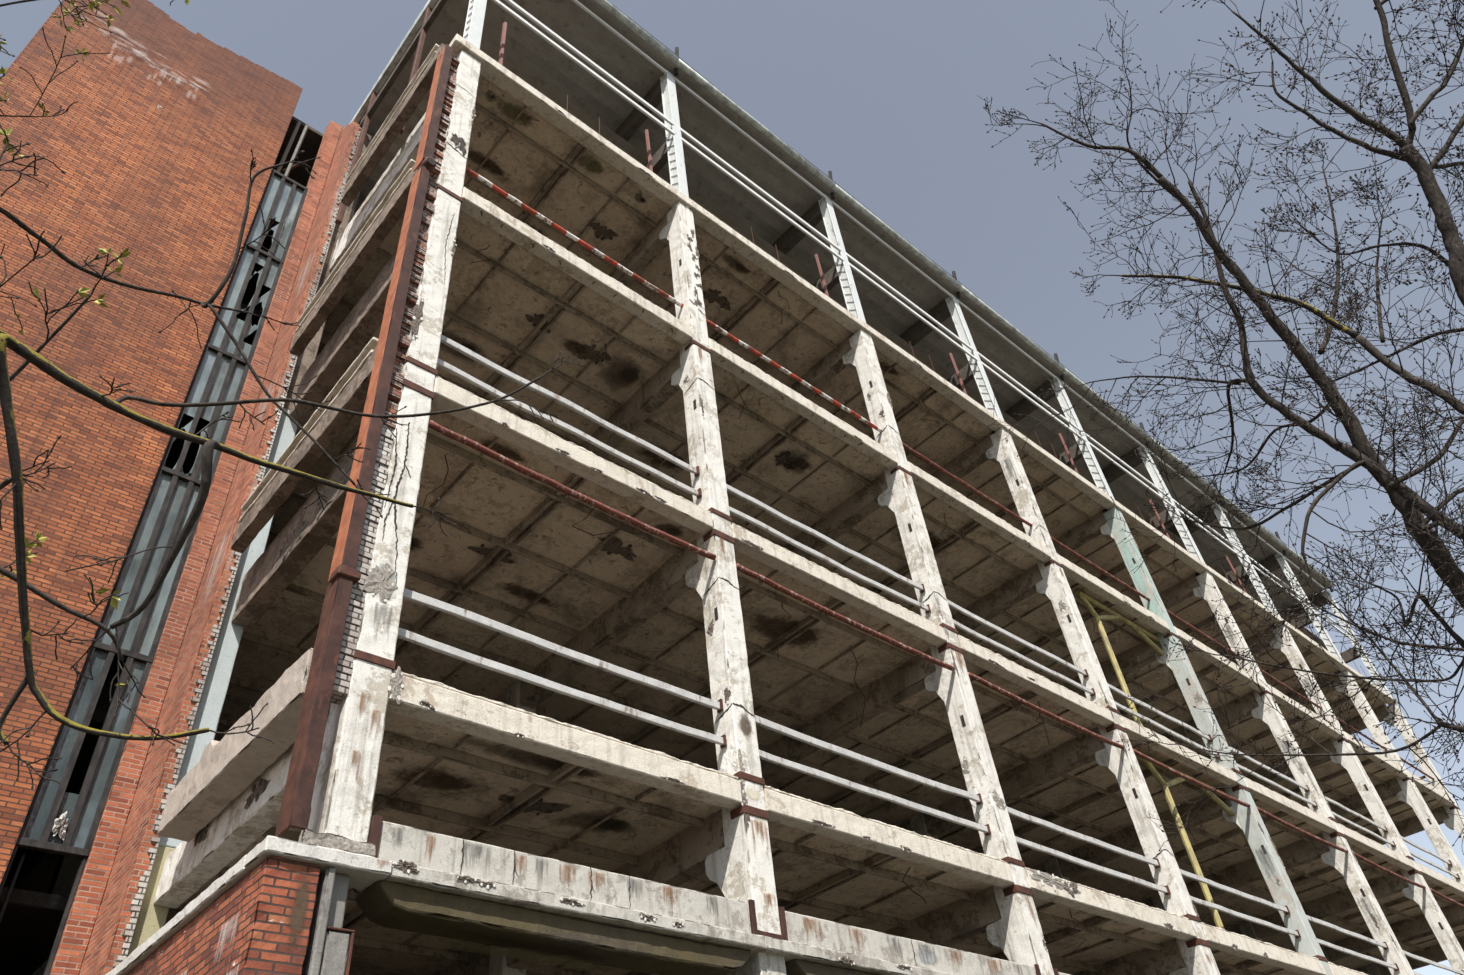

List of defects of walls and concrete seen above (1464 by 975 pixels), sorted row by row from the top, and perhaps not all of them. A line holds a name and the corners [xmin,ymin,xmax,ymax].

leakage [468,151,502,175]
leakage [565,340,587,355]
leakage [482,440,522,461]
leakage [643,448,682,469]
leakage [658,525,679,535]
spalling [362,563,398,602]
leakage [503,584,548,604]
leakage [758,618,816,645]
leakage [740,715,752,735]
leakage [493,748,591,776]
leakage [396,769,469,791]
leakage [574,814,624,830]